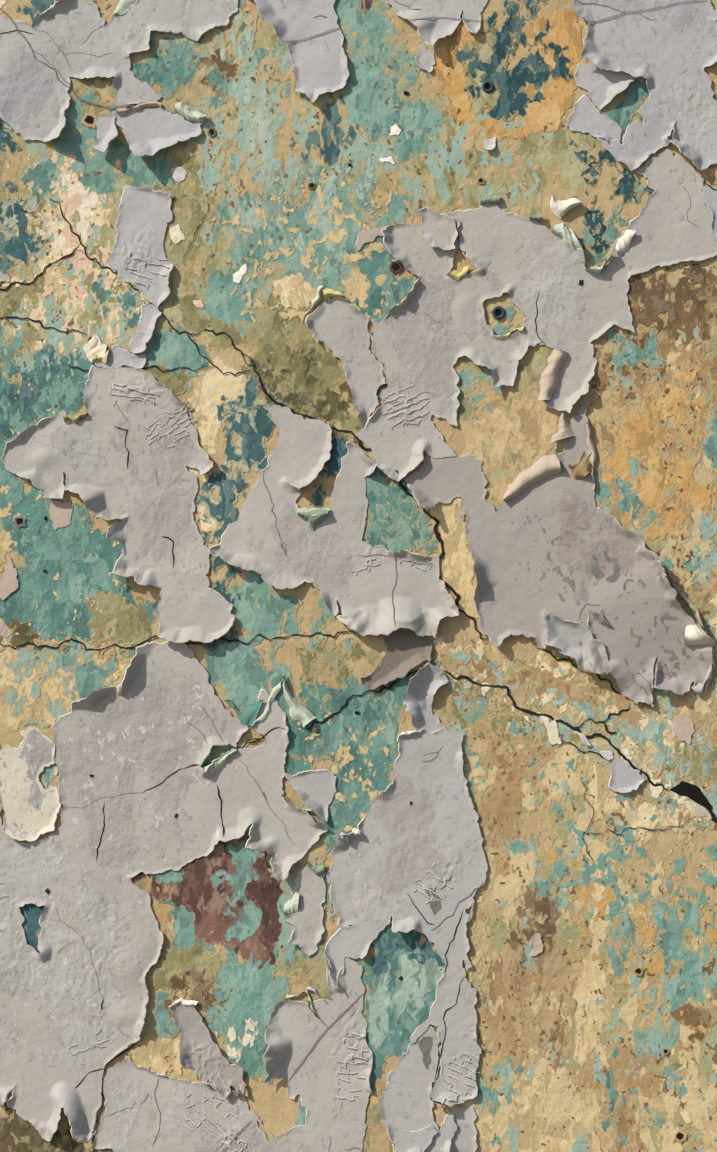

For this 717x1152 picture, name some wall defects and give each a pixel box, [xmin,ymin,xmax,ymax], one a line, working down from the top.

flaking render [636,328,700,382]
flaking render [677,384,717,509]
crack [60,647,670,860]
crack [582,782,717,860]
flaking render [687,972,717,1008]